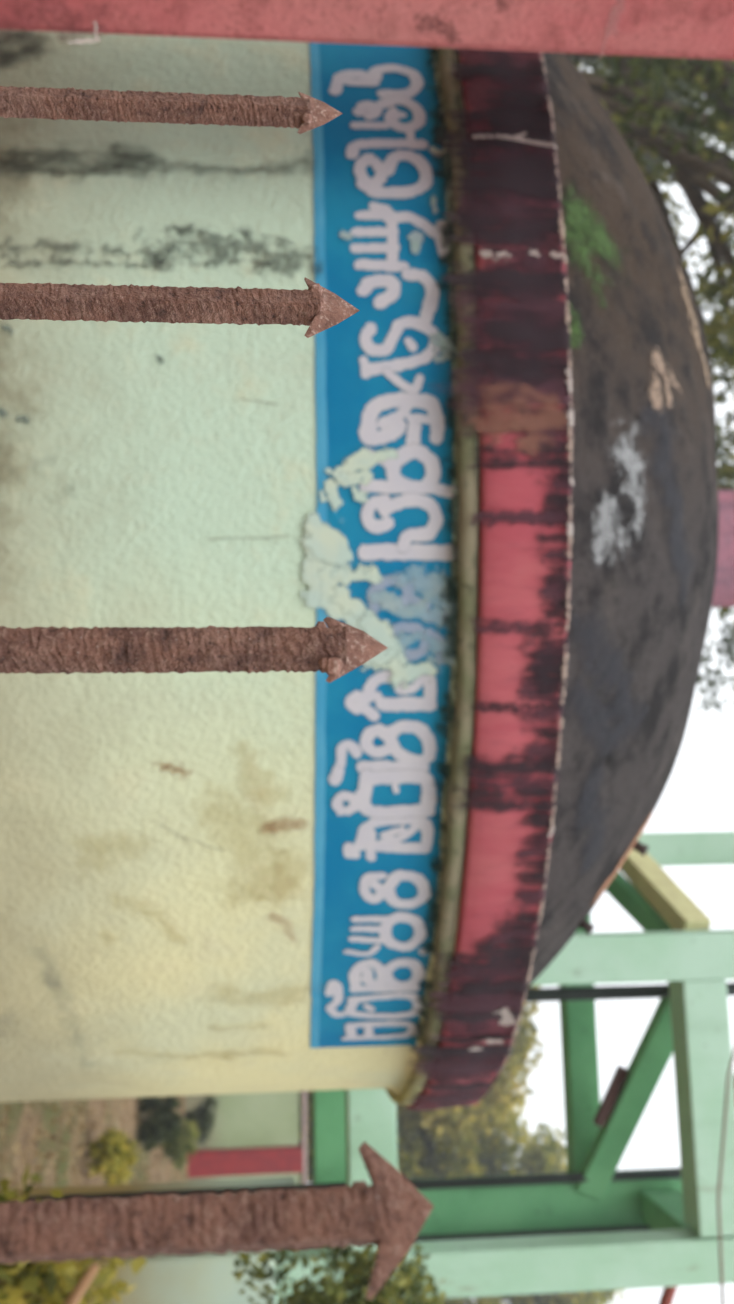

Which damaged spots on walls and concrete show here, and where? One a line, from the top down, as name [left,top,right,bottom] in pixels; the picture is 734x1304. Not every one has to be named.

spalling [649,347,682,410]
peeling [301,446,458,689]